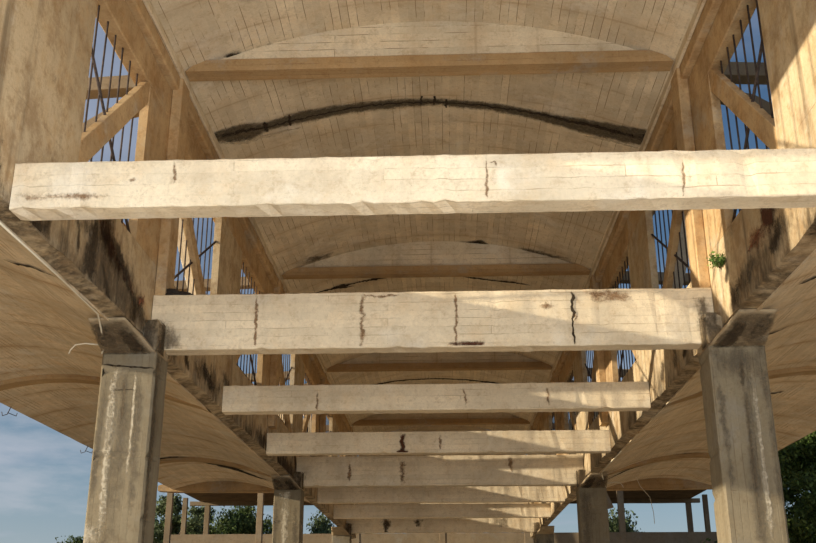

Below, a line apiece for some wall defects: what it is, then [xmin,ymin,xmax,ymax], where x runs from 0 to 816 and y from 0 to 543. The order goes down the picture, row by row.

crack [214,96,646,147]
crack [485,161,497,197]
crack [6,260,53,276]
crack [466,277,530,286]
crack [252,299,260,345]
crack [317,278,397,340]
crack [450,295,483,346]
crack [569,292,577,344]
crack [396,434,408,481]